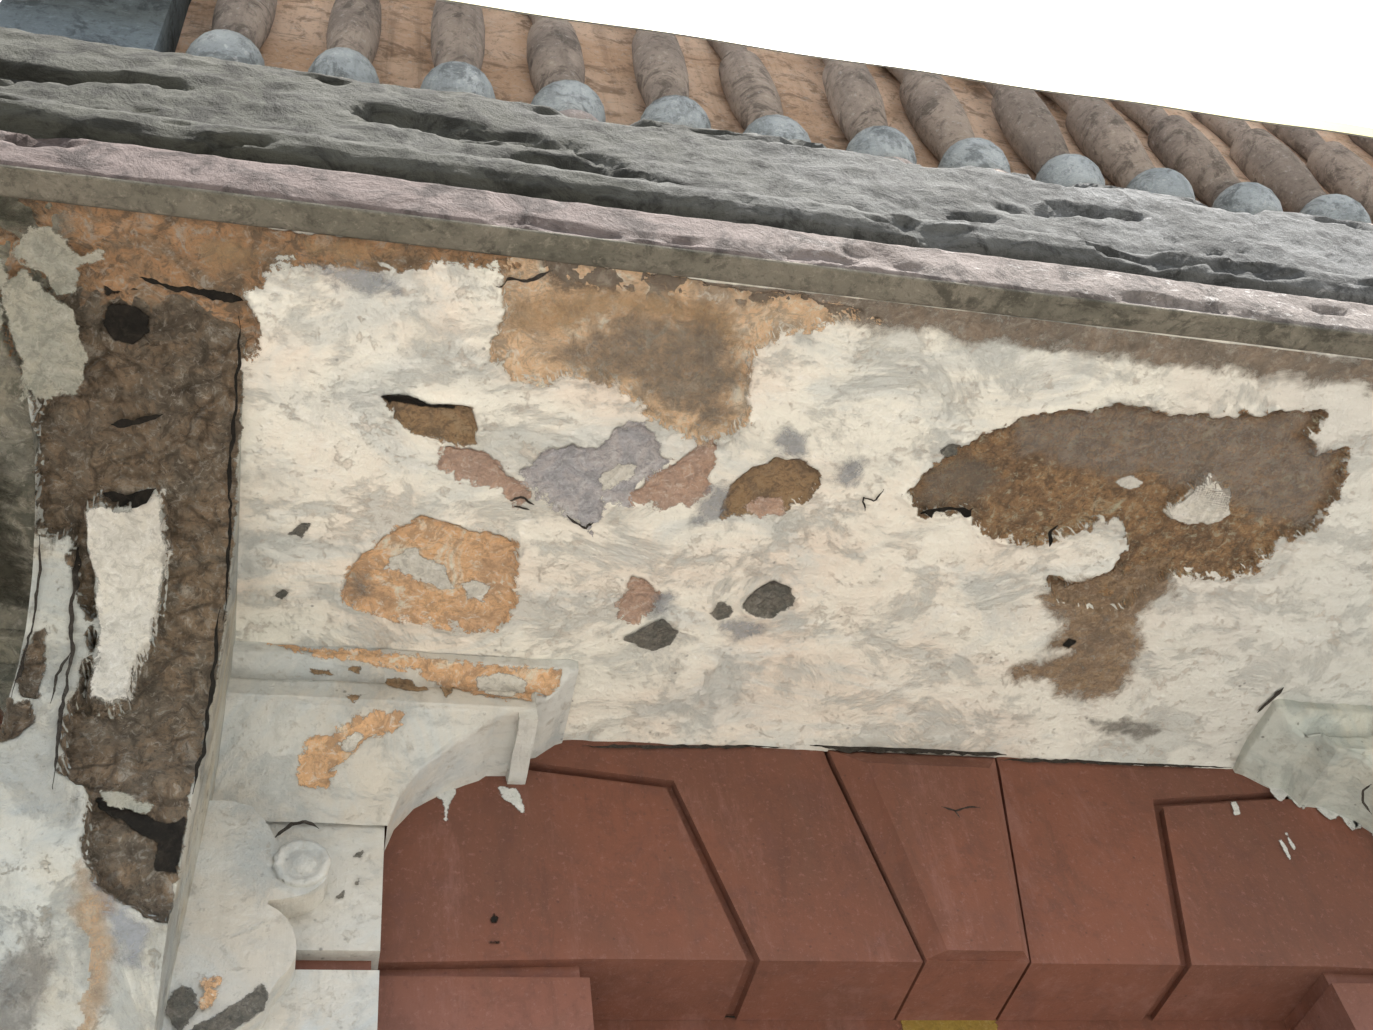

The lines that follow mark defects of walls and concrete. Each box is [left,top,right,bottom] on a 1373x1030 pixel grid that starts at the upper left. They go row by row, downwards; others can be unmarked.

crack [11,522,82,789]
spalling [0,198,884,923]
spalling [907,403,1353,699]
spalling [165,975,268,1030]